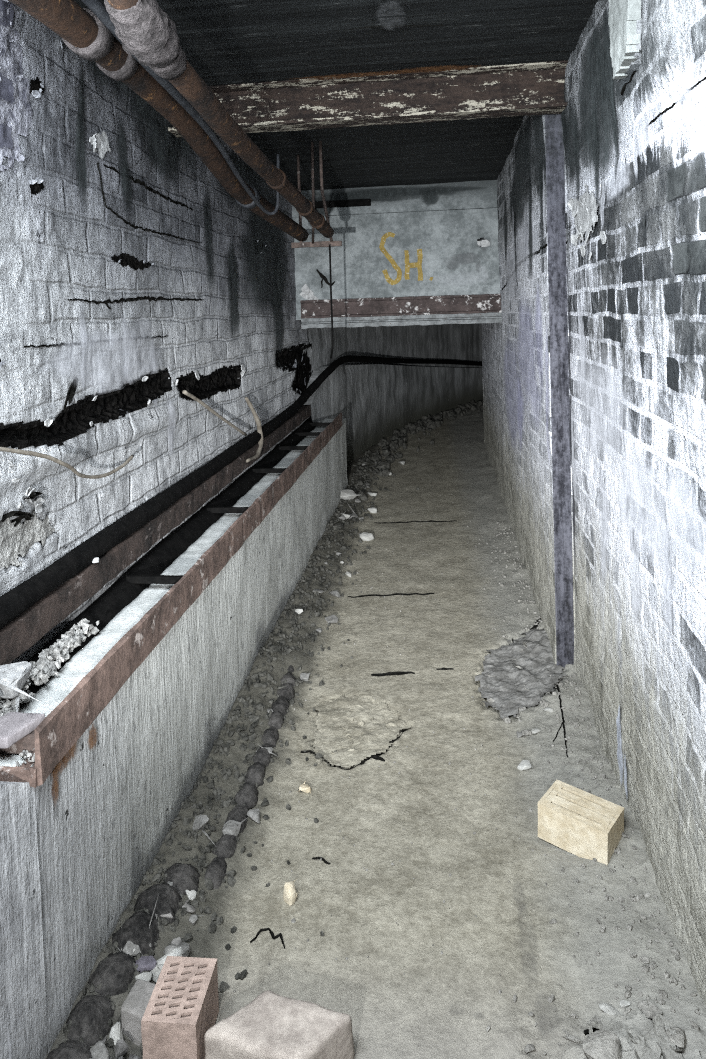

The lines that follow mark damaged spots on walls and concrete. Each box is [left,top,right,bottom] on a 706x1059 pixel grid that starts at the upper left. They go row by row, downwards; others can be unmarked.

water stain [592,68,650,224]
water stain [667,151,706,291]
spalling [0,364,246,449]
spalling [0,461,57,570]
rust [52,725,97,803]
crack [300,729,406,770]
crack [553,684,568,757]